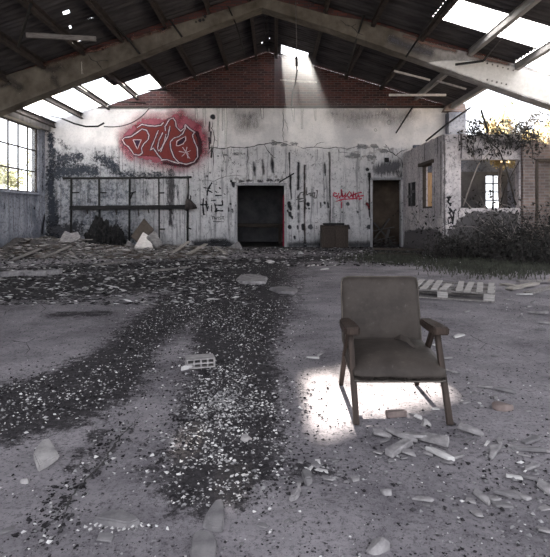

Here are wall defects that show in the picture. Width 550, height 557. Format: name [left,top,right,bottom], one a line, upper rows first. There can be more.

leakage [41,130,179,238]
crack [199,115,357,190]
leakage [373,161,403,190]
leakage [193,239,234,247]